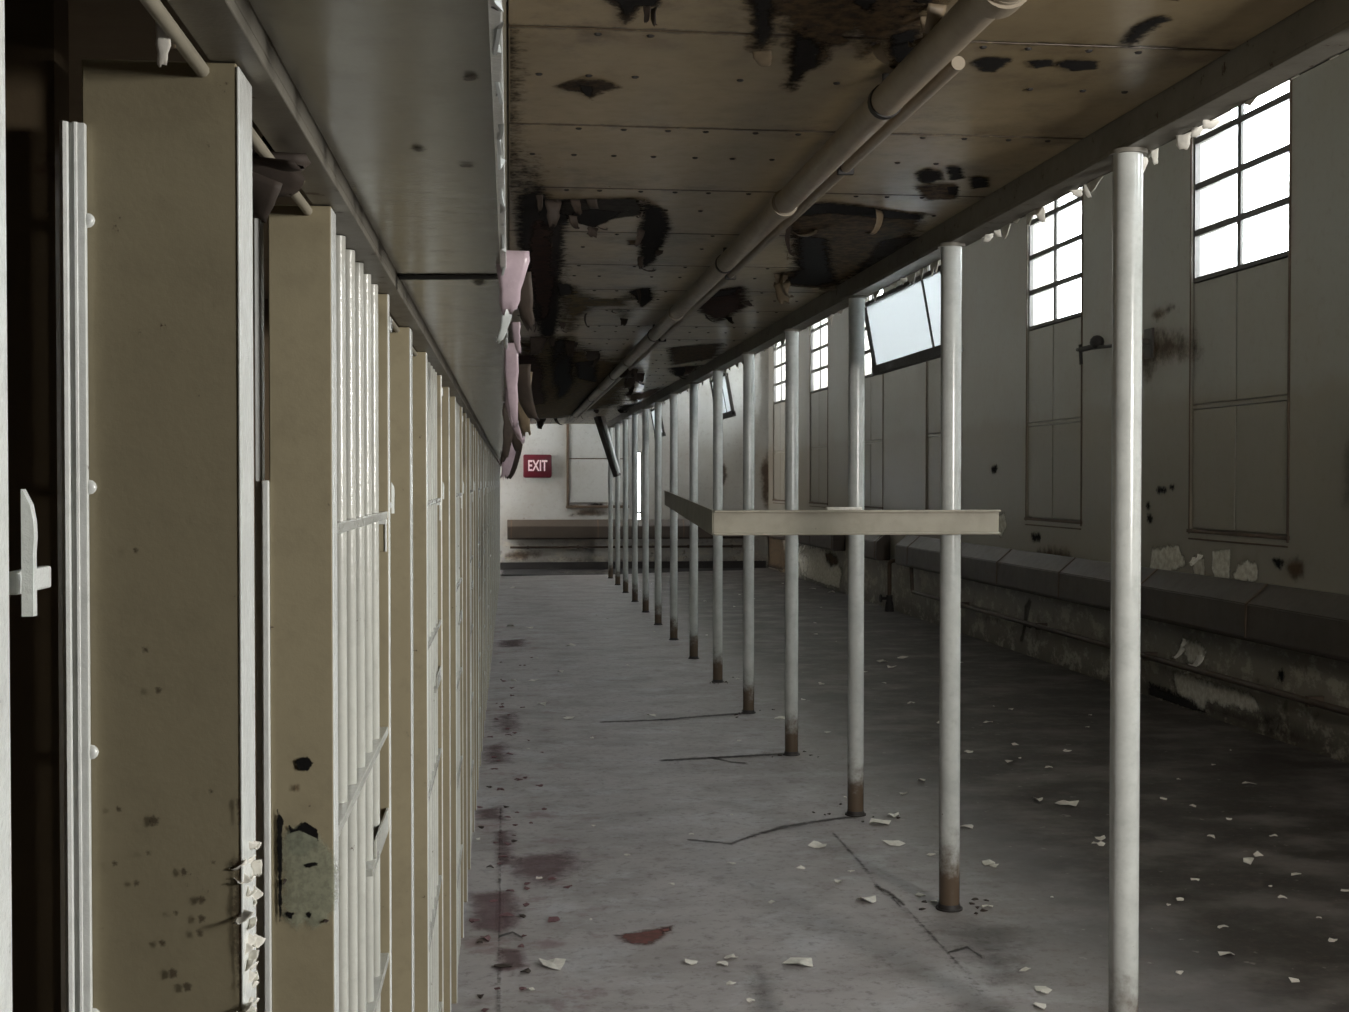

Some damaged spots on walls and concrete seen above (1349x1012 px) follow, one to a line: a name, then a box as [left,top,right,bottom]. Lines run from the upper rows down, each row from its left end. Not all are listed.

peeling [745,0,947,90]
peeling [1176,119,1220,150]
peeling [1143,148,1159,173]
peeling [1069,185,1091,198]
peeling [539,198,672,272]
peeling [773,202,925,304]
peeling [983,229,1002,242]
peeling [1150,545,1258,582]
spalling [295,757,313,790]
spalling [229,809,337,1012]